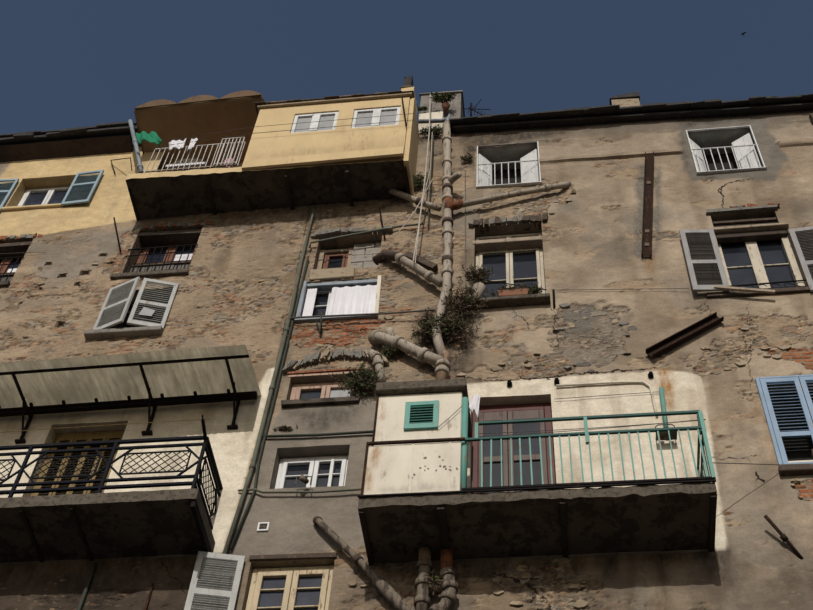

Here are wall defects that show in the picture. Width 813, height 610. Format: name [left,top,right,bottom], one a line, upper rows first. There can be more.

flaking render [74,231,135,286]
flaking render [1,262,53,312]
flaking render [281,311,394,348]
flaking render [454,303,637,381]
flaking render [686,315,813,377]
flaking render [790,478,813,501]